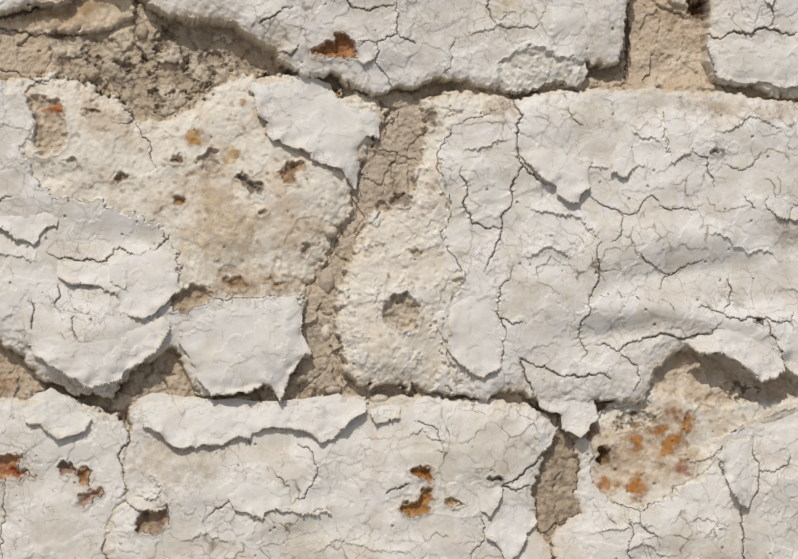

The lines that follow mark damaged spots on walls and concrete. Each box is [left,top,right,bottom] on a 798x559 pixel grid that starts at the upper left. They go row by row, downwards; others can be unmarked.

crack [347,0,416,83]
crack [616,0,631,83]
spalling [686,0,710,20]
crack [701,5,796,39]
crack [460,93,545,269]
peeling [0,212,58,245]
peeling [21,2,592,449]
crack [497,195,794,410]
rust [630,435,642,451]
spalling [476,318,798,559]
rust [654,407,695,455]
rust [597,477,645,493]